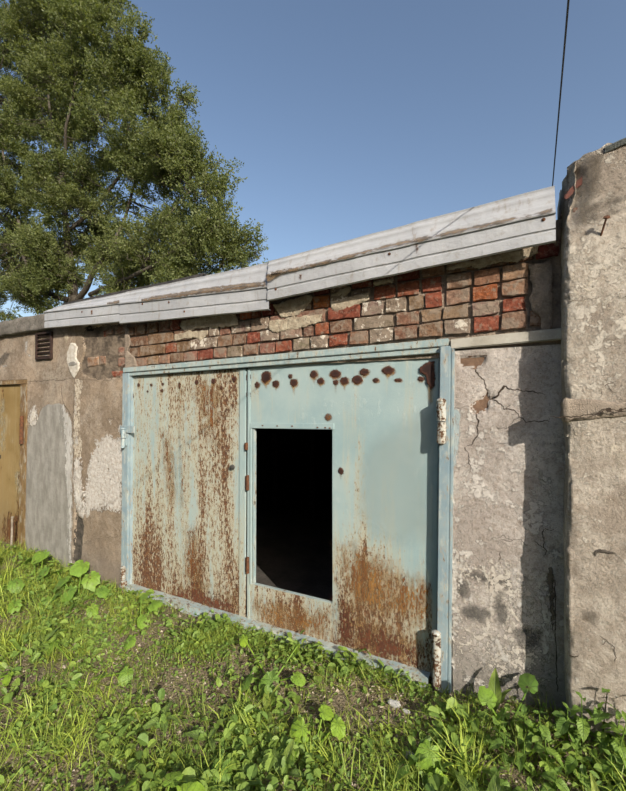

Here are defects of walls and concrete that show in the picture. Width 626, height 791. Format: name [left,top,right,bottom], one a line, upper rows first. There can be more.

peeling [446,246,539,271]
peeling [174,314,239,341]
peeling [269,294,322,333]
rust [310,366,402,386]
rust [418,361,436,391]
crack [475,370,626,429]
peeling [68,324,127,562]
crack [455,407,479,471]
leakage [456,572,510,597]
rust [257,544,432,671]
leakage [462,599,507,623]
leakage [514,629,540,646]